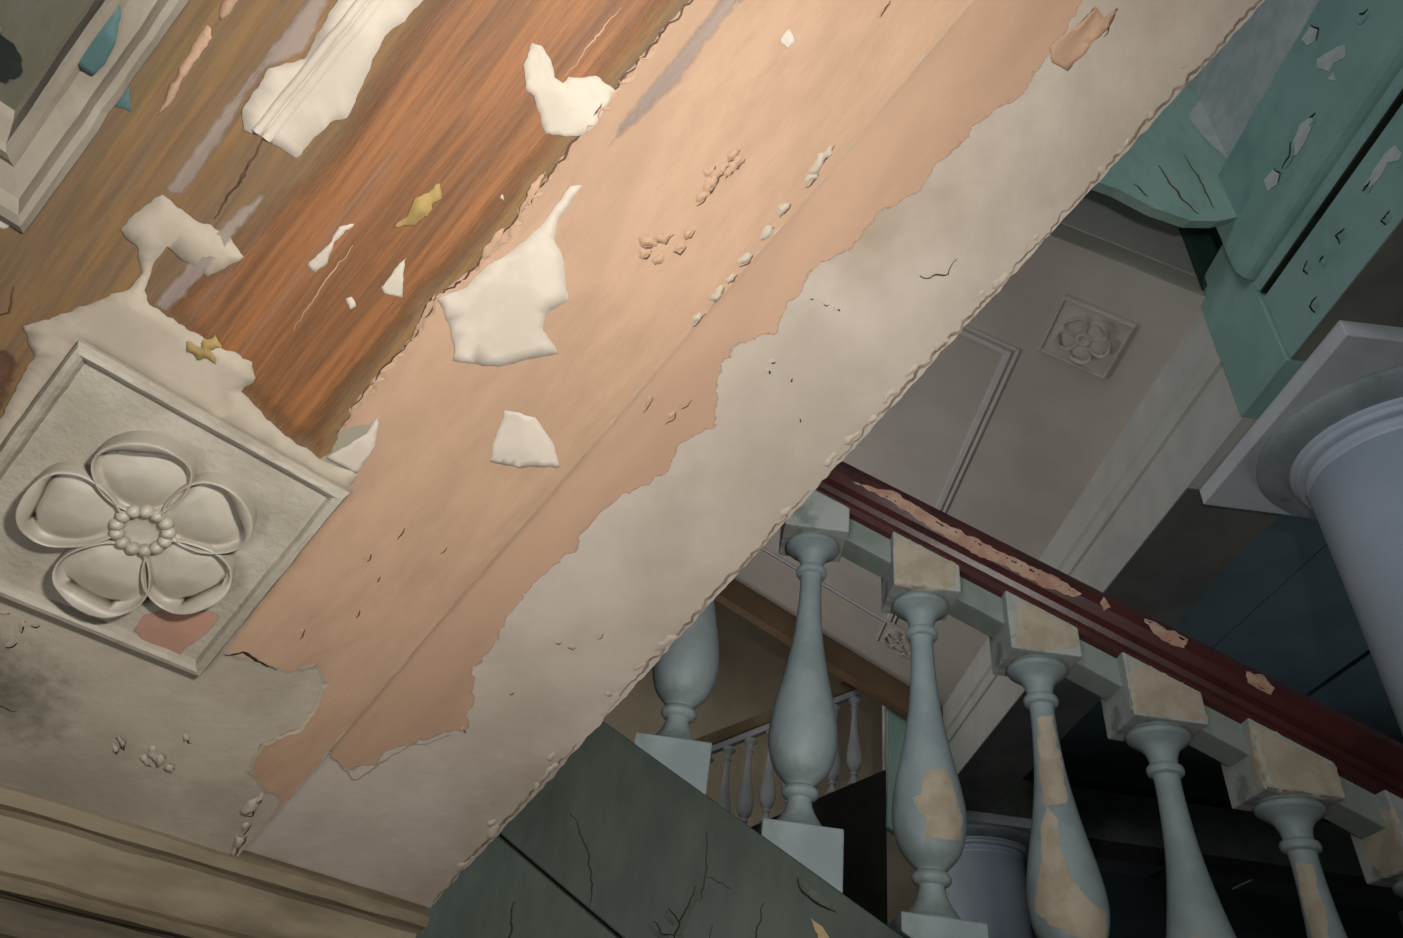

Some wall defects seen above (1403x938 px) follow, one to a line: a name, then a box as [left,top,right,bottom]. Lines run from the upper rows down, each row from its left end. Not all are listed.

peeling [1302,25,1345,81]
crack [1134,155,1214,214]
crack [0,287,14,316]
peeling [0,0,1117,856]
peeling [1144,618,1188,648]
peeling [1128,657,1208,723]
peeling [1246,671,1275,694]
peeling [1249,720,1345,803]
peeling [1035,715,1108,938]
crack [570,814,593,907]
crack [797,877,837,912]
peeling [811,919,829,938]